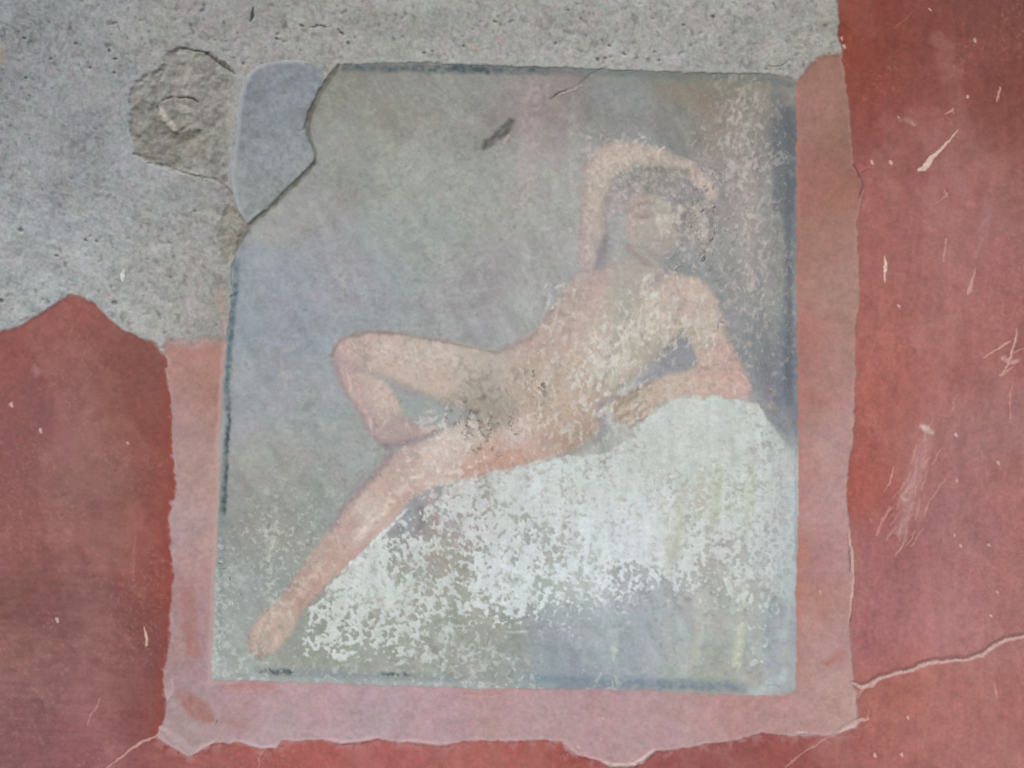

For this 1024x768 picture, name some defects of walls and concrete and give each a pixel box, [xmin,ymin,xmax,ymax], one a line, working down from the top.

spalling [128,46,248,268]
peeling [917,129,959,172]
peeling [180,93,810,694]
crack [849,632,1024,700]